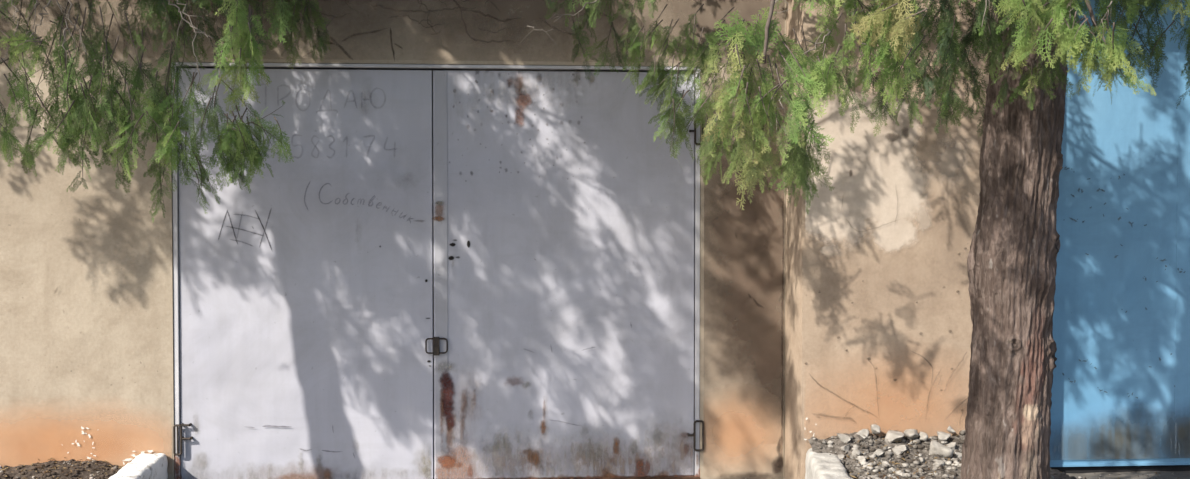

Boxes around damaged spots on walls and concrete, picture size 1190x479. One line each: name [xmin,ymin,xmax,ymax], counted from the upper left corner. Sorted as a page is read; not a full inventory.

corrosion [516,94,531,126]
water stain [0,420,160,467]
corrosion [435,373,473,479]
corrosion [497,451,554,479]